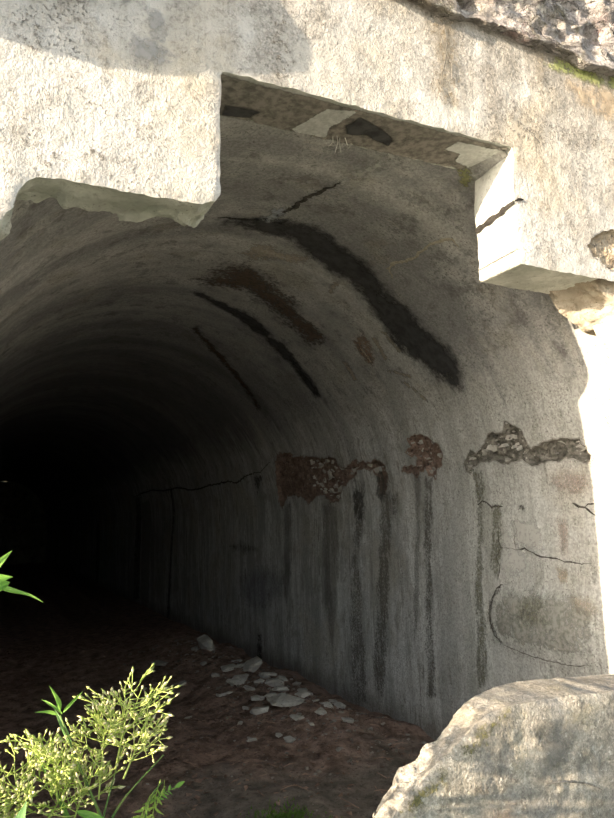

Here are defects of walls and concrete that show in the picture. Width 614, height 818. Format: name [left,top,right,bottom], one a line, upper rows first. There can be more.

crack [217,182,341,221]
crack [475,198,524,234]
spalling [586,228,614,271]
water stain [193,208,463,409]
spalling [274,452,389,509]
spalling [401,433,443,481]
spalling [464,420,596,474]
crack [478,500,590,578]
water stain [350,471,397,701]
water stain [425,476,436,698]